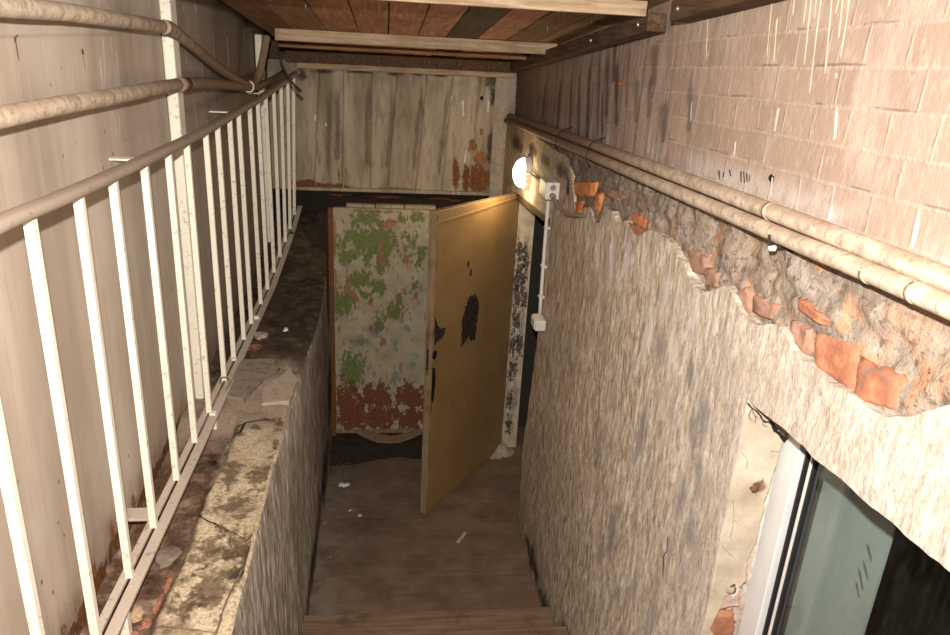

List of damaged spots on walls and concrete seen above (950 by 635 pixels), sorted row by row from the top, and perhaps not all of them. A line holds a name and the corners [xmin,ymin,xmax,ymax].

damp [556,47,618,140]
rust [296,129,490,202]
damp [911,215,920,249]
peeling [333,209,427,352]
flaking render [528,126,950,416]
crack [227,419,270,444]
flaking render [710,567,748,635]